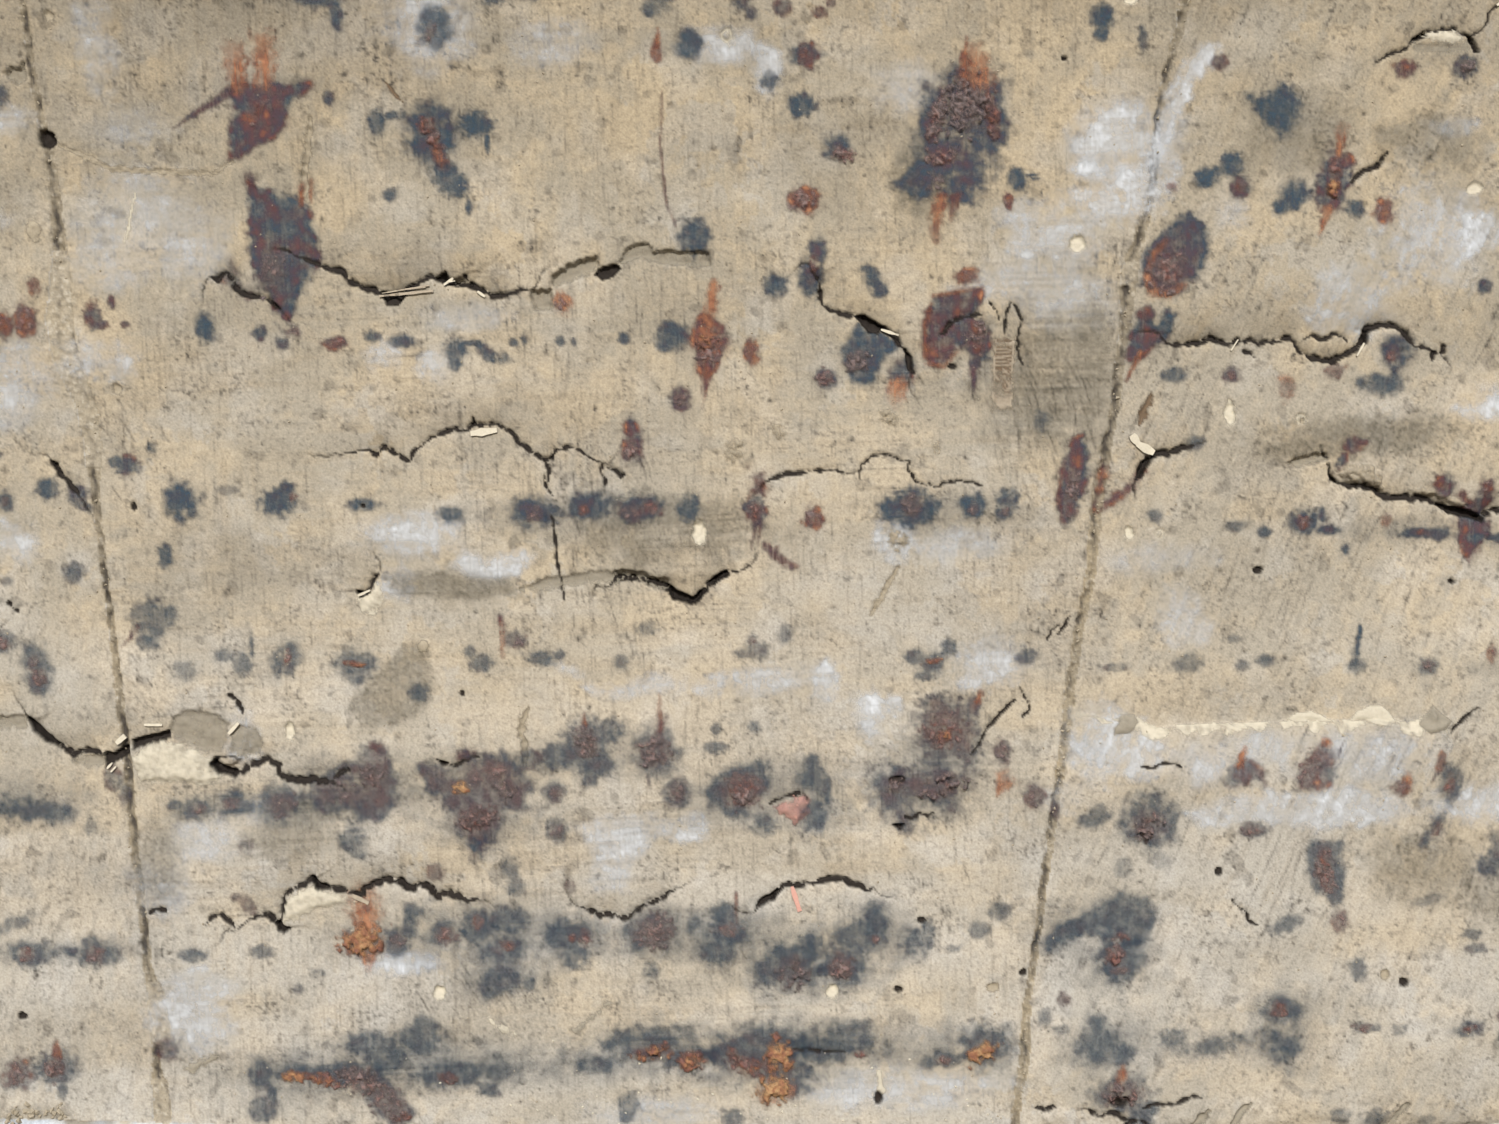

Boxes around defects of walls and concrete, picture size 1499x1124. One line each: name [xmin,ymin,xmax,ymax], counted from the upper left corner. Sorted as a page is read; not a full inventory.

corrosion [184,47,312,159]
corrosion [246,177,322,334]
corrosion [814,267,992,396]
corrosion [1125,211,1208,377]
crack [1141,322,1448,365]
crack [340,417,754,605]
crack [25,712,171,772]
leakage [859,694,901,733]
leakage [1072,708,1163,777]
leakage [802,755,830,831]
crack [207,875,479,933]
leakage [378,953,435,974]